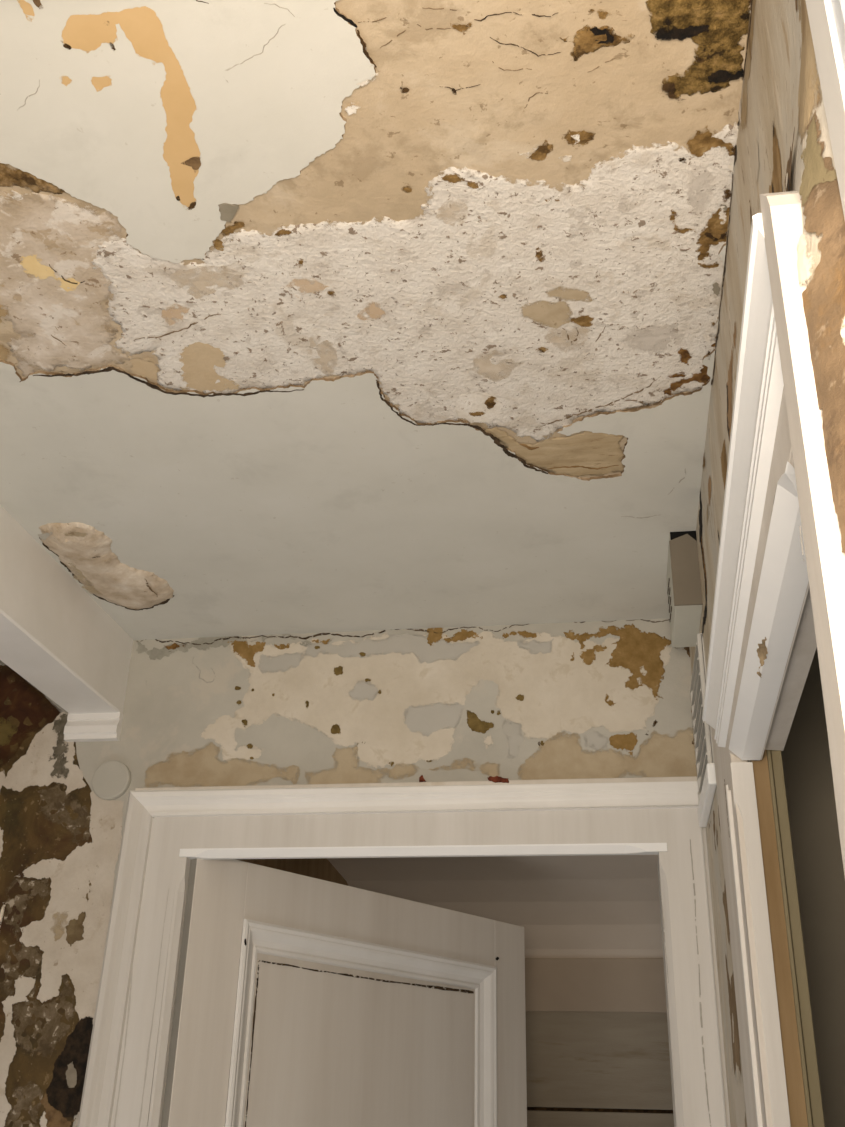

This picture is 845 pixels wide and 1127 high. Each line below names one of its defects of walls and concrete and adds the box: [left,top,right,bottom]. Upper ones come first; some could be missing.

leakage [740,0,756,130]
leakage [679,126,735,163]
peeling [753,122,783,193]
peeling [0,0,751,478]
peeling [795,0,845,553]
peeling [200,624,690,769]
peeling [757,637,768,677]
flaking render [0,712,124,1127]